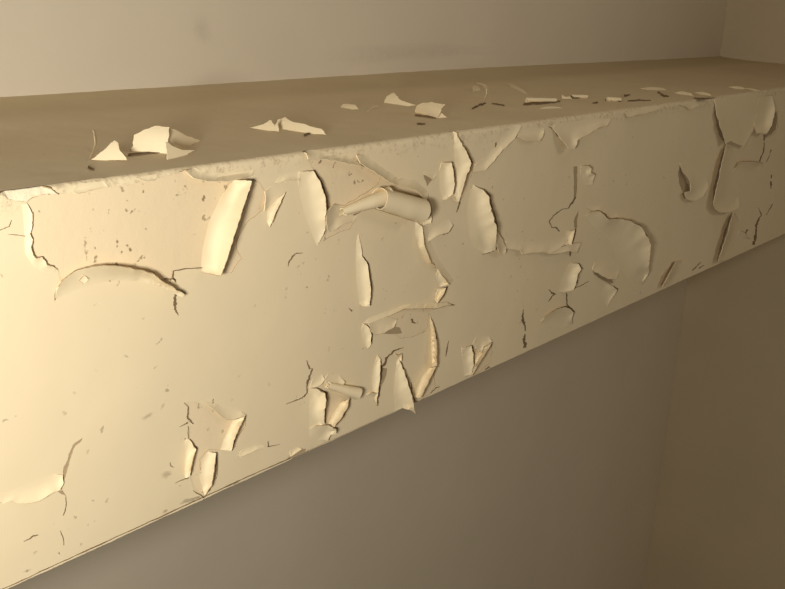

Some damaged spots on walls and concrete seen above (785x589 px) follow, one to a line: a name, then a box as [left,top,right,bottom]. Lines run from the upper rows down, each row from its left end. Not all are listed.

peeling [86,129,127,171]
peeling [250,117,326,136]
peeling [340,93,414,111]
peeling [624,86,778,261]
peeling [0,150,399,314]
peeling [423,119,651,329]
peeling [361,198,454,415]
peeling [461,336,492,376]
peeling [0,439,82,516]
crack [2,458,290,589]
peeling [176,399,280,498]
peeling [309,388,350,440]